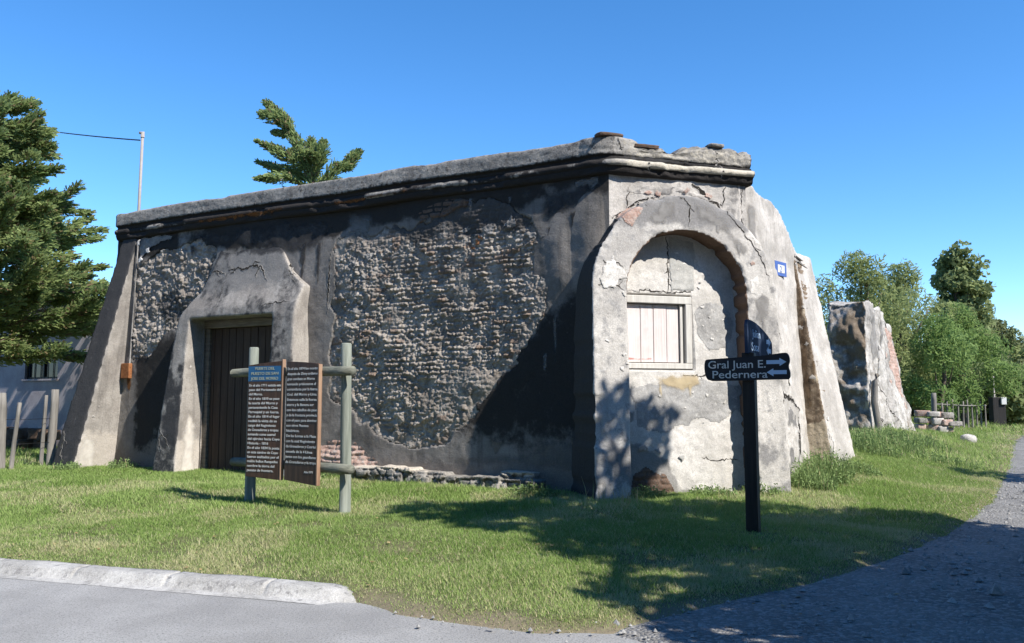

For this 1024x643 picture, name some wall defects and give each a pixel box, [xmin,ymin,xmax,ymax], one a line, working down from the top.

crack [612,151,770,282]
spalling [132,235,217,360]
crack [209,261,295,306]
peeling [600,256,628,297]
spalling [329,197,548,449]
damp [660,376,699,394]
peeling [181,416,194,471]
spalling [321,440,378,476]
spalling [631,467,674,495]